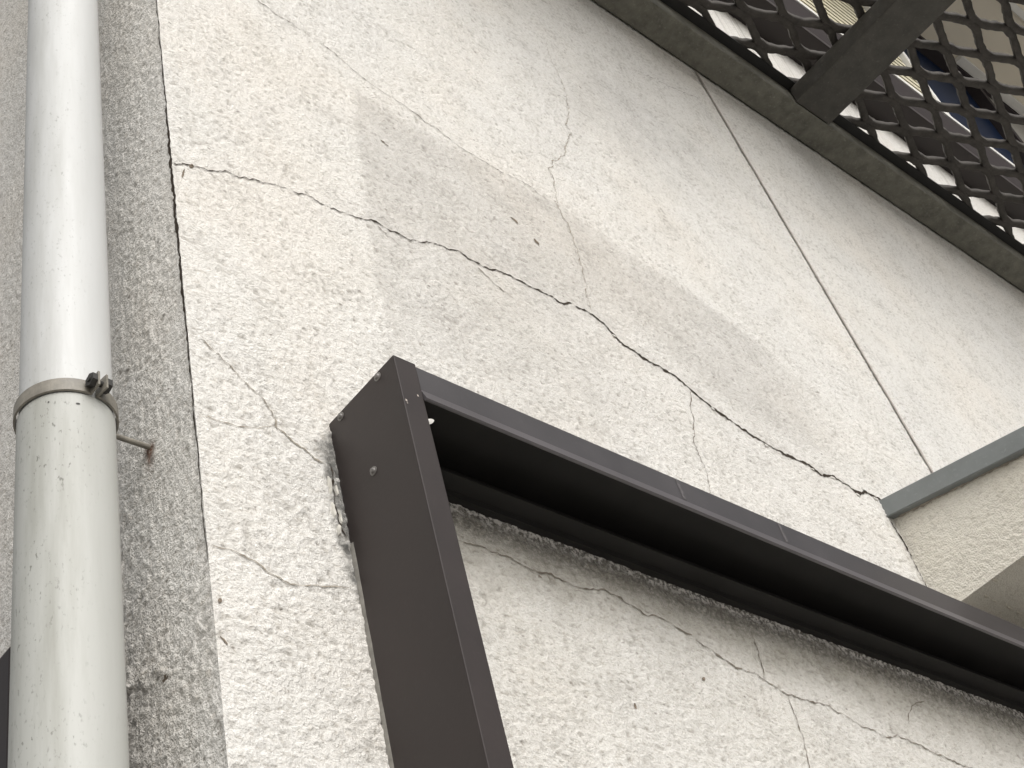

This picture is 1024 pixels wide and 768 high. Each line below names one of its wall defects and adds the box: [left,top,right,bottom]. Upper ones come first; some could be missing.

crack [156,0,926,588]
crack [459,540,972,768]